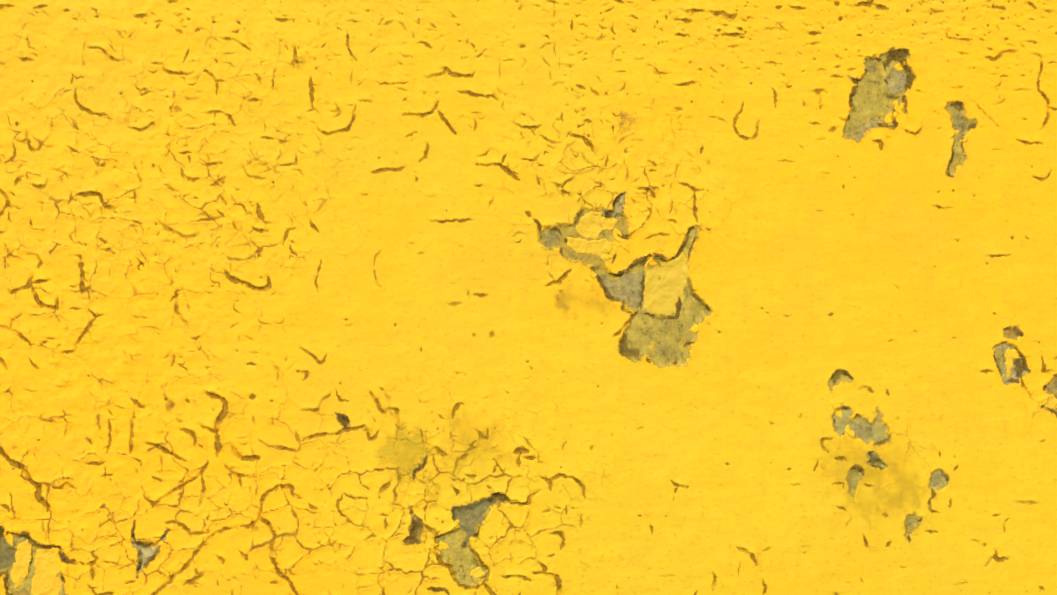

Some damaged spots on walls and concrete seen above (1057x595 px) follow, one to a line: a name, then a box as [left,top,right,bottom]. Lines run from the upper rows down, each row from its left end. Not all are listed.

crack [372,41,496,173]
peeling [843,47,916,142]
crack [180,151,322,290]
crack [10,262,103,365]
peeling [525,192,712,368]
peeling [991,326,1031,385]
crack [0,446,73,512]
peeling [0,523,84,595]
crack [87,390,399,595]
peeling [403,492,509,595]
crack [422,523,565,595]
peeling [828,370,890,497]